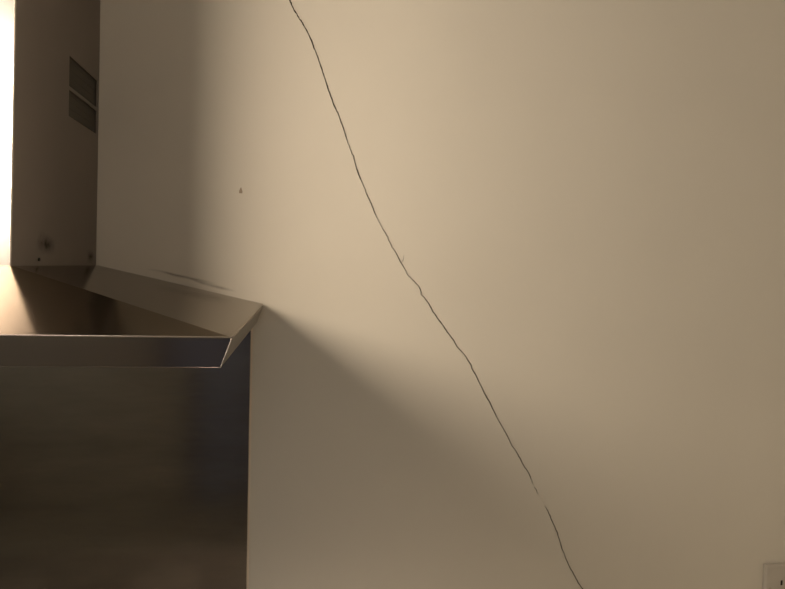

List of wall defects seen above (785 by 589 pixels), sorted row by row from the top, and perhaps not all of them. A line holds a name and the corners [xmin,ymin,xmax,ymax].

crack [289,0,537,491]
crack [546,508,583,589]